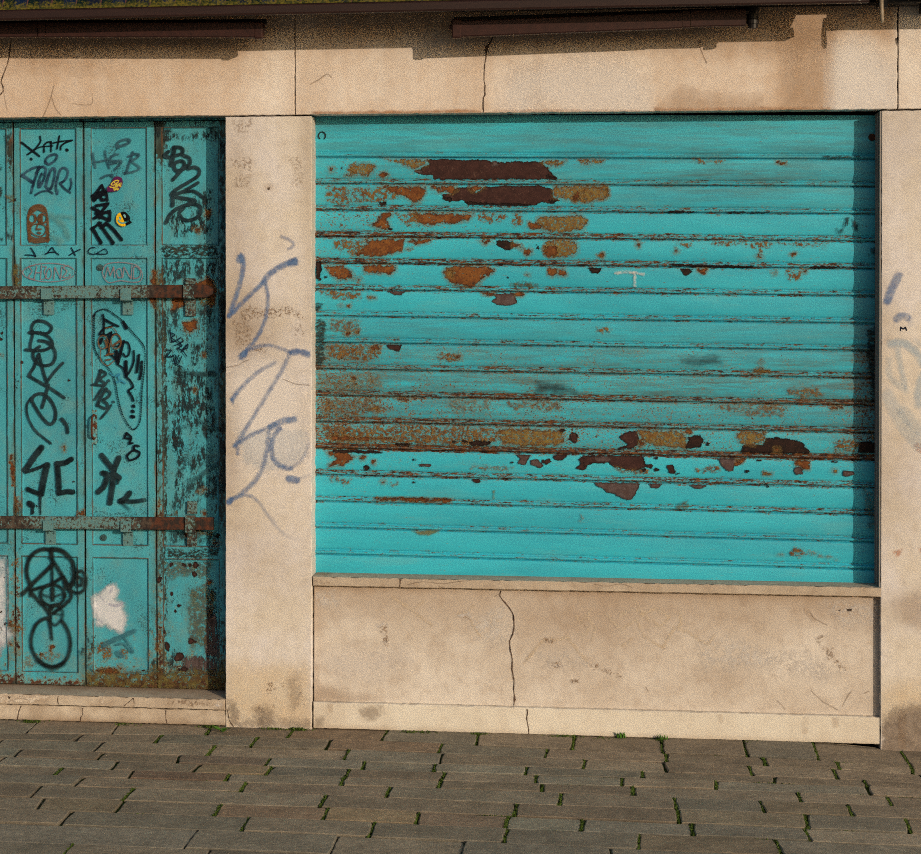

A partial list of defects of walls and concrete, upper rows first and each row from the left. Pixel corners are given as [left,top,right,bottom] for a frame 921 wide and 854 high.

crack [0,39,12,95]
crack [482,37,493,112]
corrosion [554,184,609,203]
corrosion [316,162,588,308]
corrosion [672,239,823,276]
corrosion [324,319,402,362]
corrosion [322,398,564,485]
corrosion [794,459,811,475]
corrosion [157,562,217,646]
corrosion [85,629,226,690]
crack [499,591,529,734]
water stain [882,690,921,752]